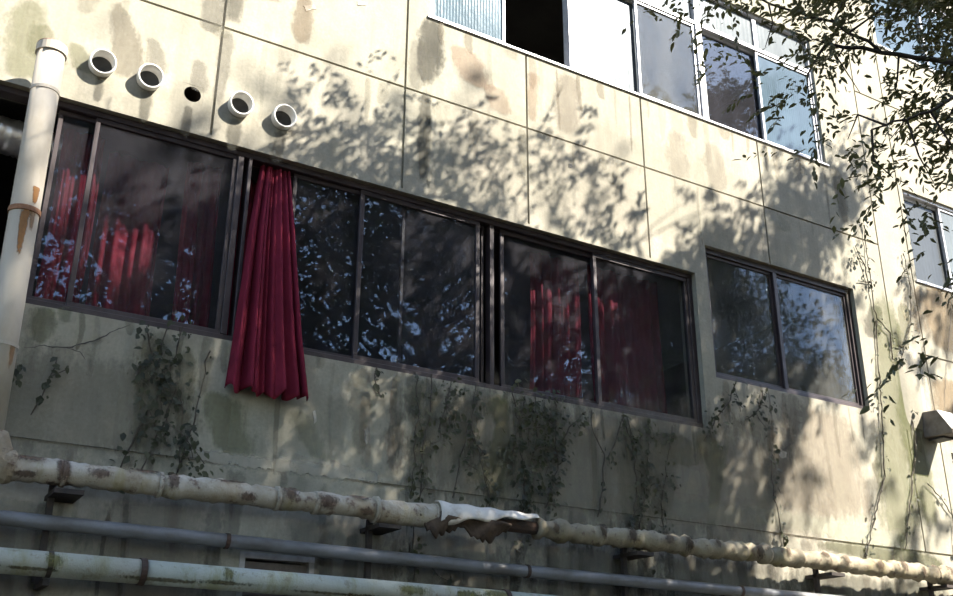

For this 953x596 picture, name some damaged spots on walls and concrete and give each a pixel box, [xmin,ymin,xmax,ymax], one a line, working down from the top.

water stain [418,20,443,80]
water stain [418,97,430,168]
corrosion [17,186,40,253]
water stain [934,379,953,414]
corrosion [14,455,46,477]
corrosion [57,460,71,482]
corrosion [319,494,338,509]